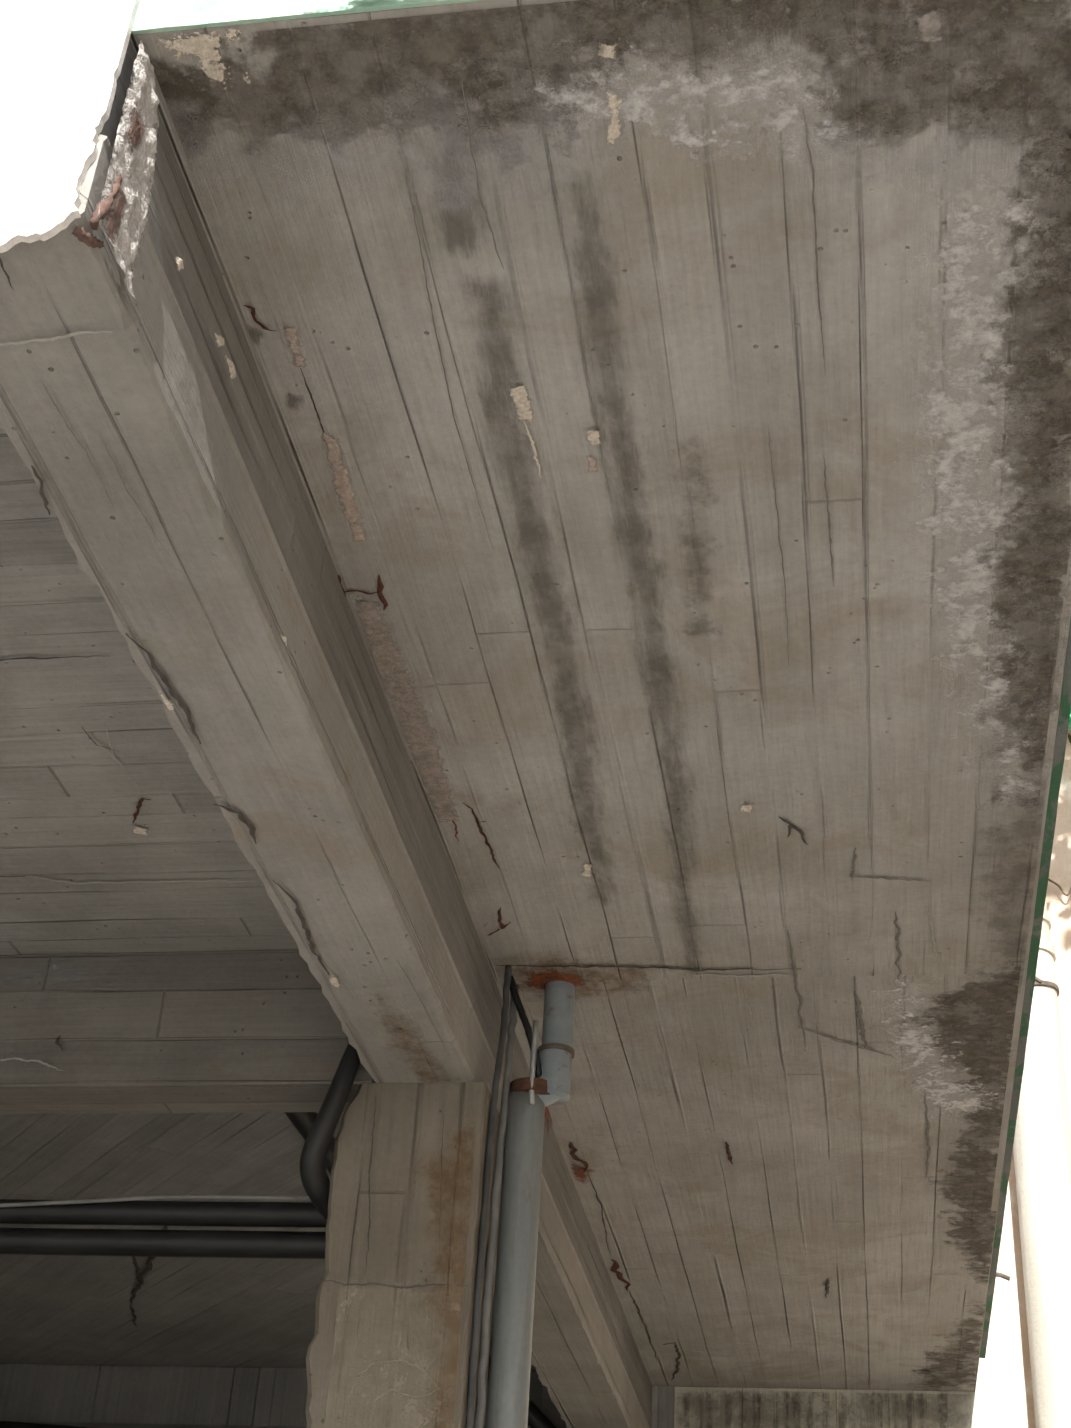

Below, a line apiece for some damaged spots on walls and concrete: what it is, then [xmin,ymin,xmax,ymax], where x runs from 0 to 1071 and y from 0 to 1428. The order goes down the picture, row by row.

corrosion [72,174,122,248]
spalling [96,28,251,302]
spalling [214,332,236,379]
water stain [150,0,1071,806]
crack [452,803,500,870]
crack [779,817,807,845]
corrosion [518,960,636,995]
crack [488,908,893,1057]
crack [850,848,944,980]
water stain [869,961,1021,1283]
crack [569,1142,682,1380]
water stain [908,1305,986,1428]